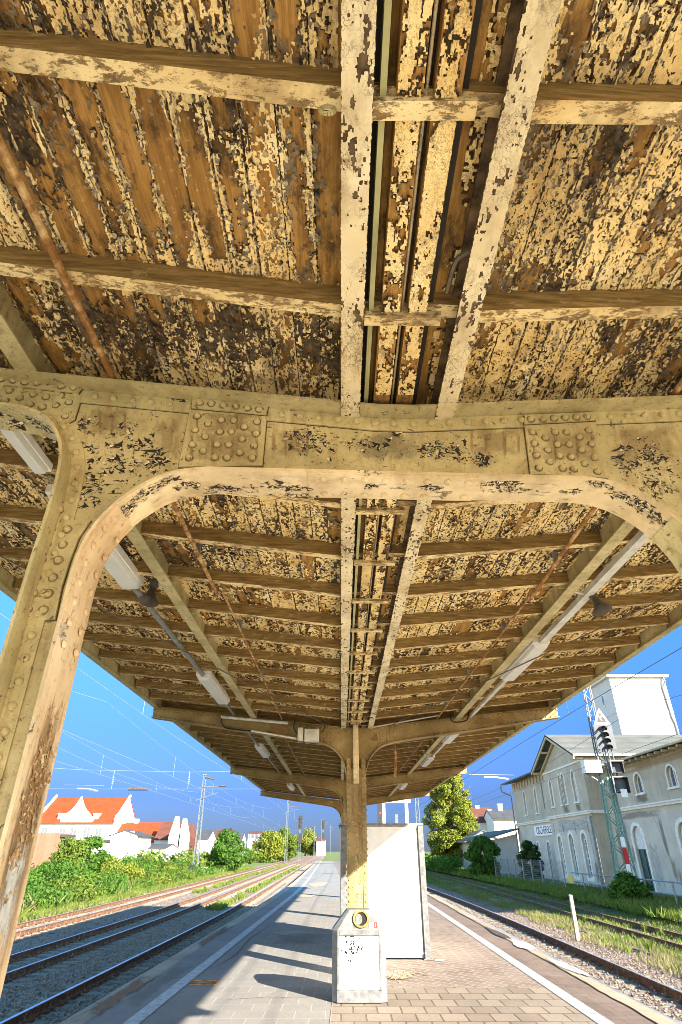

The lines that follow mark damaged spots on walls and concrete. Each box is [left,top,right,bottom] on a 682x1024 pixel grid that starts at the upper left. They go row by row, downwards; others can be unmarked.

peeling [0,0,377,417]
peeling [375,0,682,420]
peeling [0,520,41,578]
peeling [0,468,55,509]
peeling [75,414,682,729]